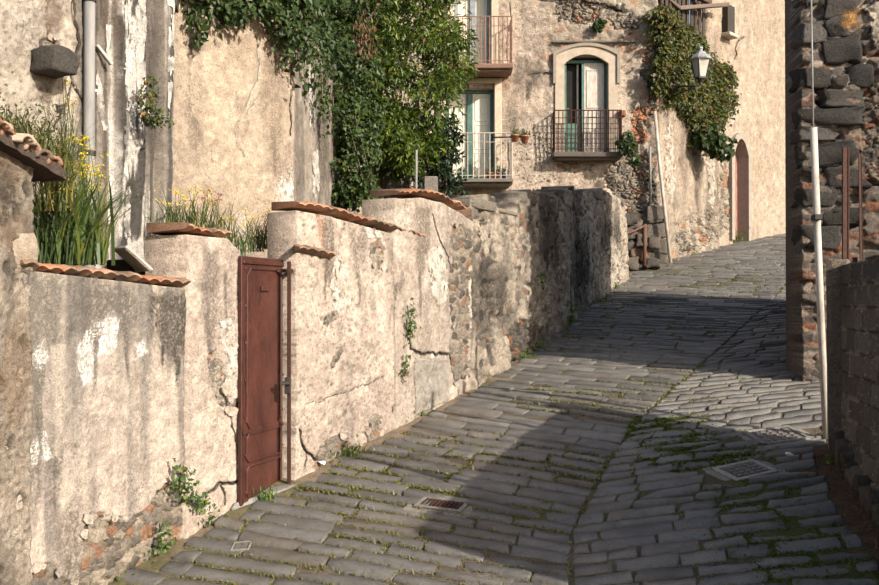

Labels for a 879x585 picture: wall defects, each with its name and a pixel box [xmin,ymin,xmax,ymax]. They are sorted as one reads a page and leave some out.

spalling [552,0,643,35]
crack [234,26,262,157]
spalling [604,38,676,215]
water stain [23,276,61,483]
water stain [75,277,136,384]
water stain [150,294,186,384]
crack [308,376,382,404]
crack [407,337,452,365]
crack [298,429,317,467]
spalling [31,483,184,585]
crack [201,481,238,506]